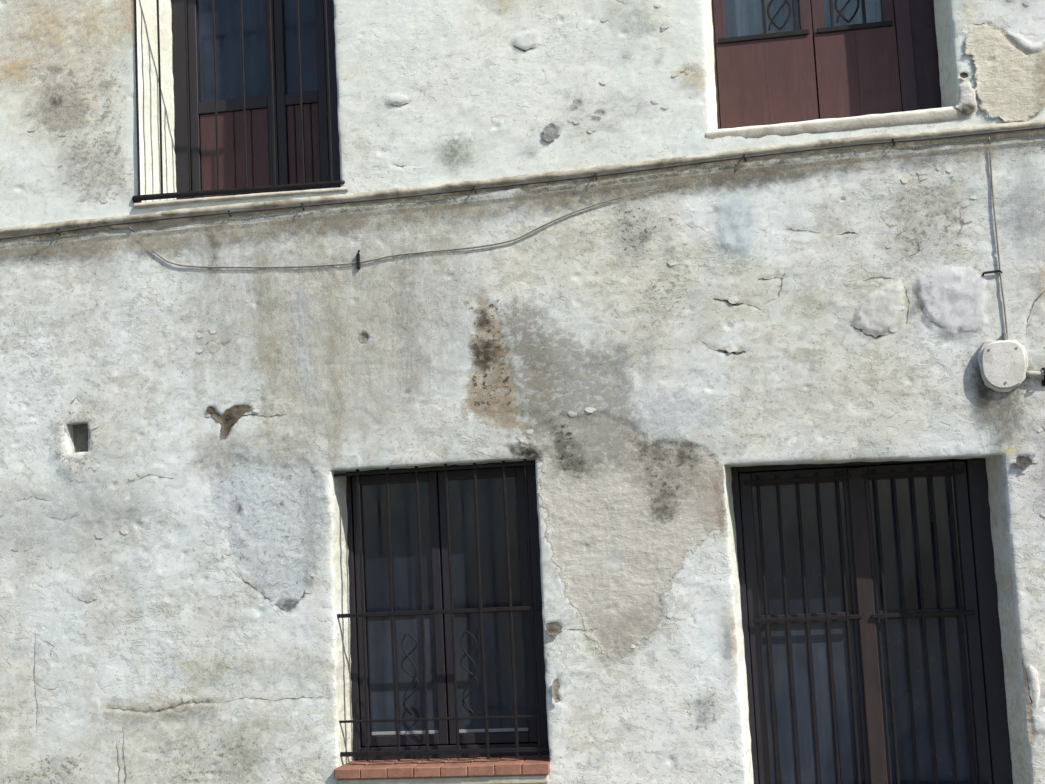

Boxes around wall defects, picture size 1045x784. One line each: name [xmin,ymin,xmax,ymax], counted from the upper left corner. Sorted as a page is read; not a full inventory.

peeling [955,23,1045,122]
crack [1026,277,1045,337]
damp [549,420,585,473]
peeling [508,301,727,658]
damp [640,443,702,514]
crack [110,695,327,784]